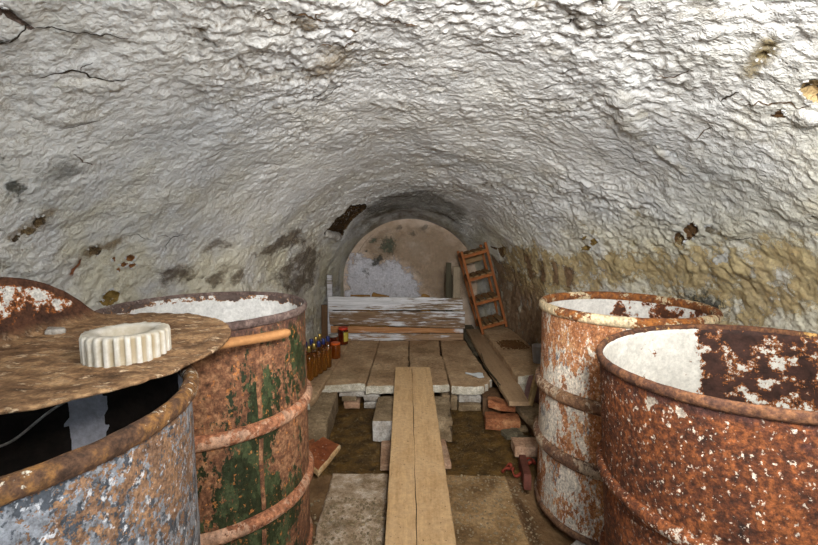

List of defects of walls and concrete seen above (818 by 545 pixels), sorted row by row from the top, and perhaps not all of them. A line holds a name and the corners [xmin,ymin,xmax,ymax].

crack [0,24,128,45]
crack [41,63,127,82]
spalling [799,79,818,105]
spalling [673,221,715,245]
damp [161,265,194,281]
damp [207,271,222,287]
damp [261,229,320,295]
damp [491,233,818,347]